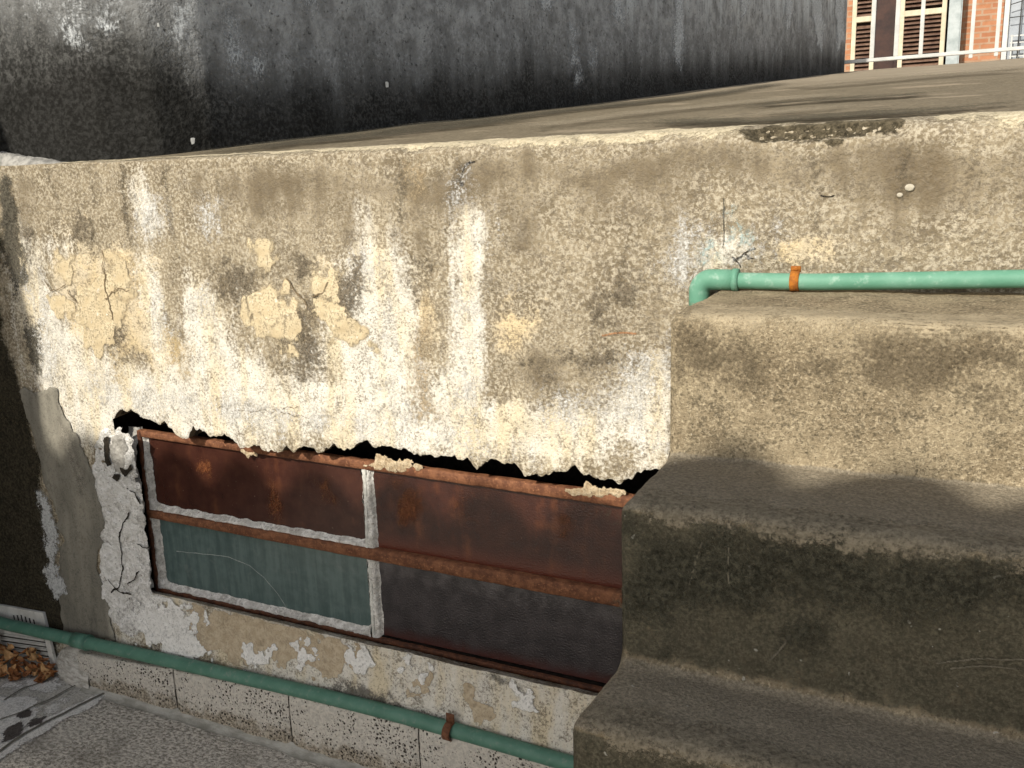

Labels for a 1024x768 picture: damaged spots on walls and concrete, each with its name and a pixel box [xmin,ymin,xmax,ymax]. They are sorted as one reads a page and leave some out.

spalling [739,118,905,146]
damp [0,175,41,296]
damp [23,298,60,386]
peeling [46,248,138,359]
crack [101,250,129,320]
peeling [240,238,380,359]
damp [269,251,372,387]
damp [543,325,772,435]
damp [0,313,68,630]
spalling [286,440,660,498]
crack [108,488,150,595]
spalling [92,426,375,681]